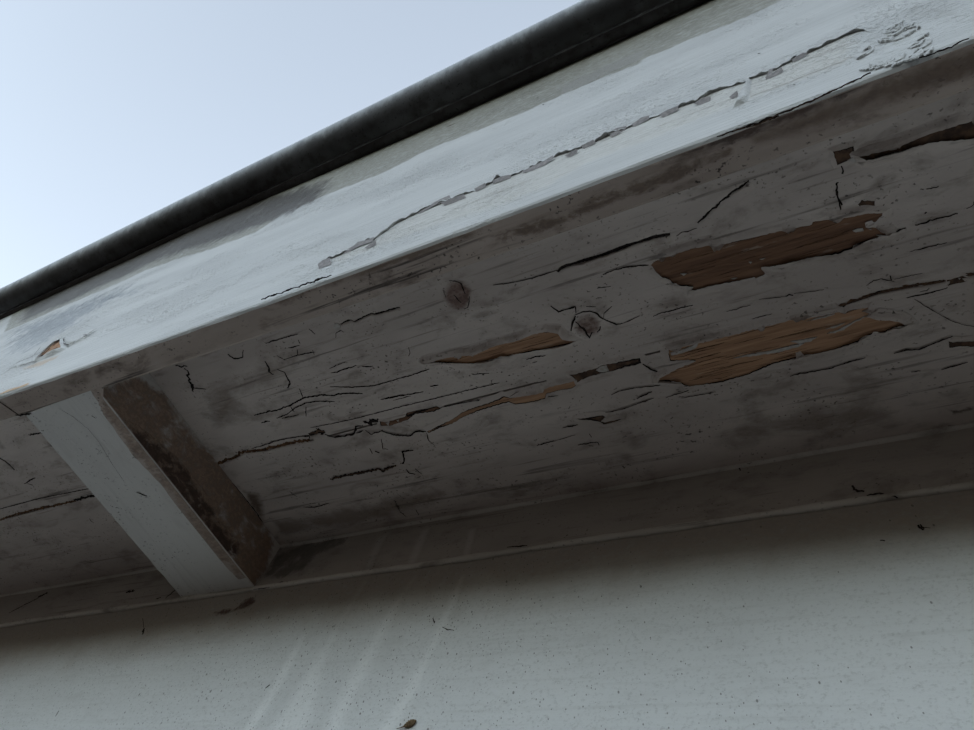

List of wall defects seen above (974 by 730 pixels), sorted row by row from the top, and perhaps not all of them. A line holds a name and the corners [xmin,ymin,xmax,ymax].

crack [261,275,332,300]
peeling [318,23,882,269]
crack [496,175,755,339]
peeling [603,110,974,296]
crack [726,202,974,327]
crack [0,455,95,522]
crack [175,365,206,392]
water stain [91,339,468,730]
crack [215,302,517,521]
peeling [377,301,919,446]
water stain [698,386,919,457]
crack [790,358,864,377]